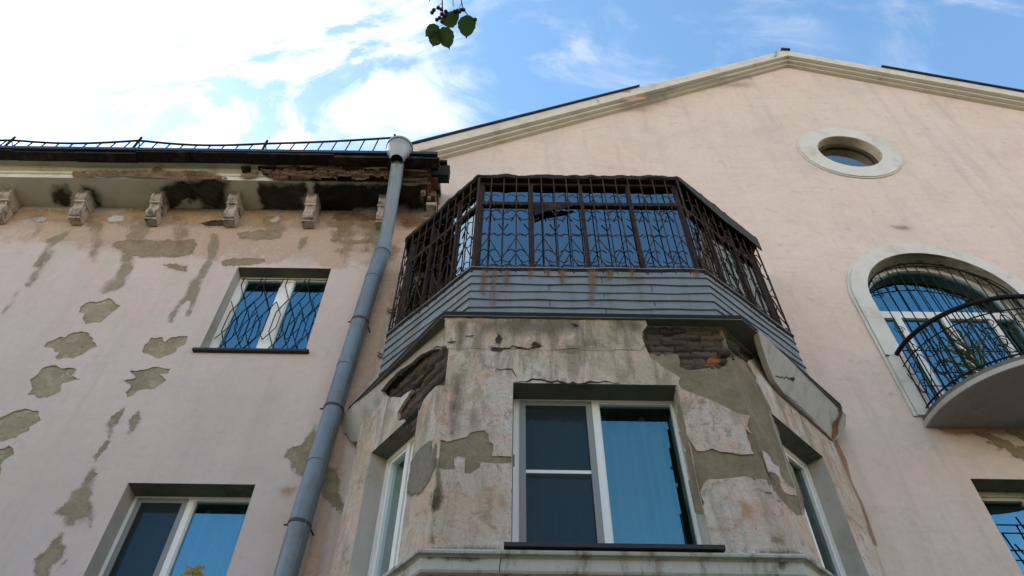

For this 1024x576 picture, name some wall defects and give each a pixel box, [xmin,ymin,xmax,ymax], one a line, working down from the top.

spalling [72,167,228,180]
spalling [261,165,390,181]
leakage [0,179,426,412]
peeling [0,220,265,474]
spalling [386,335,473,432]
crack [492,345,620,385]
peeling [55,337,188,527]
spalling [285,431,316,477]
spalling [321,466,344,511]
spalling [407,431,515,495]
spalling [642,327,805,516]
peeling [34,536,66,576]